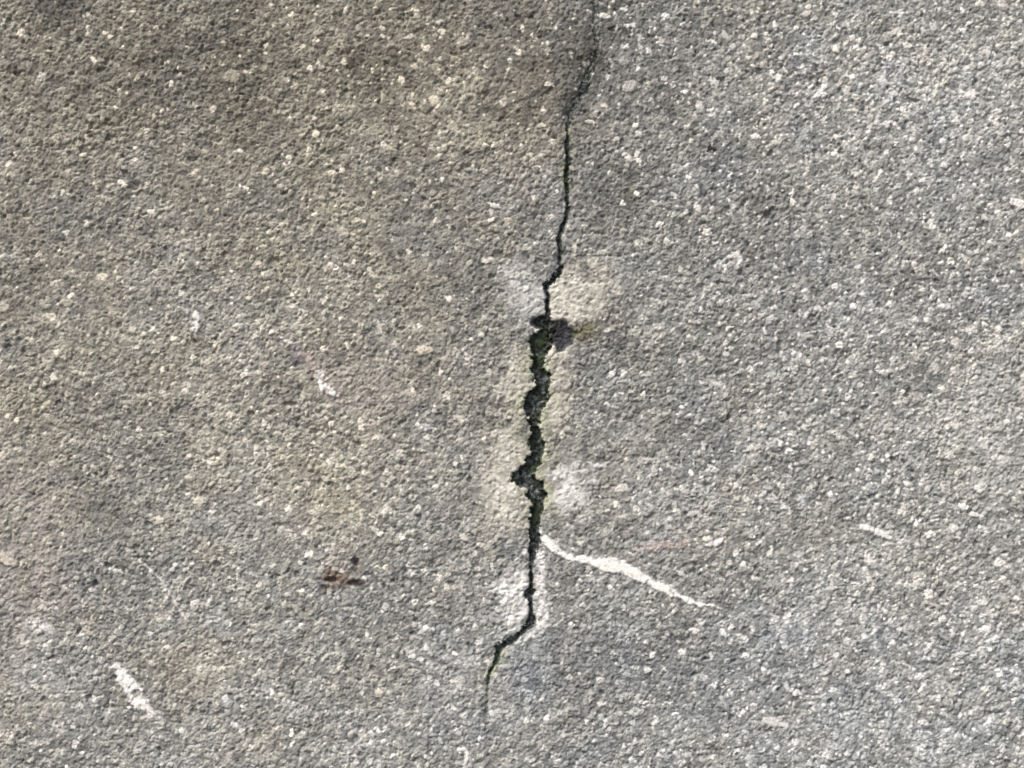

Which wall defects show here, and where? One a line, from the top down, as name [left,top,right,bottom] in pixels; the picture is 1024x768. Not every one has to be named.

crack [487,0,599,685]